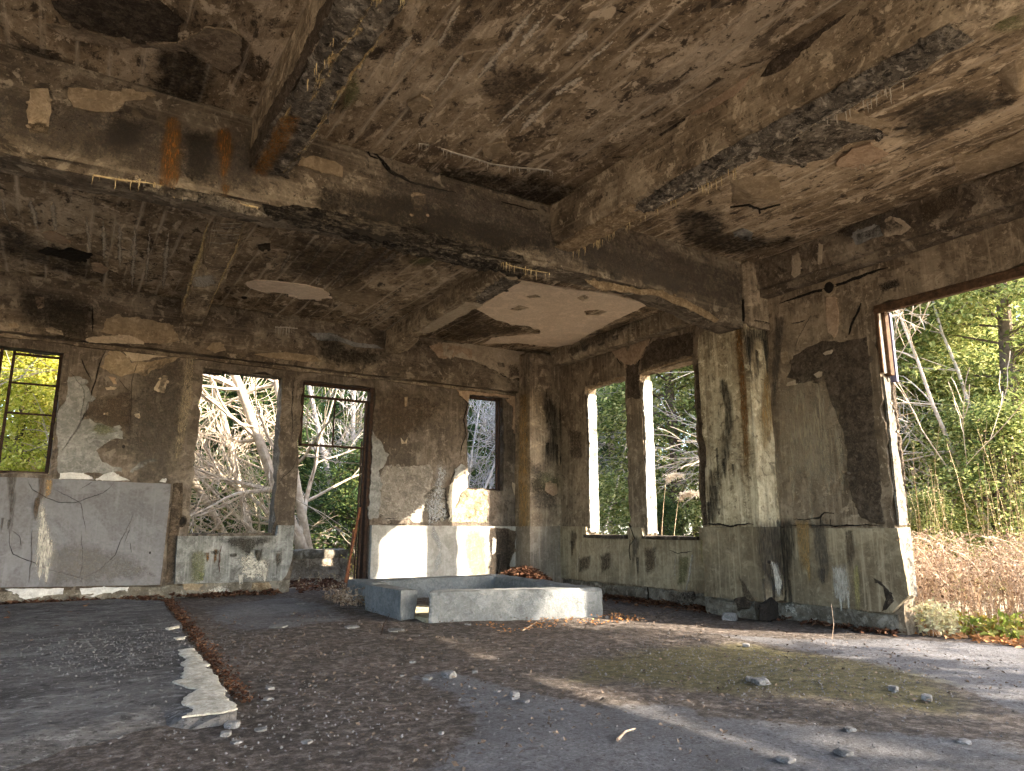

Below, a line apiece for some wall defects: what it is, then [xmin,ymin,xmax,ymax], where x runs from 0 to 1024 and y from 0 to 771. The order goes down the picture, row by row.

spalling [634,14,974,213]
crack [367,151,456,193]
crack [730,204,780,214]
spalling [39,247,109,274]
crack [742,267,888,346]
crack [9,482,133,584]
flaking render [56,376,157,481]
spalling [367,431,516,575]
water stain [707,380,734,523]
crack [703,521,754,529]
water stain [739,318,860,616]
crack [791,512,884,527]